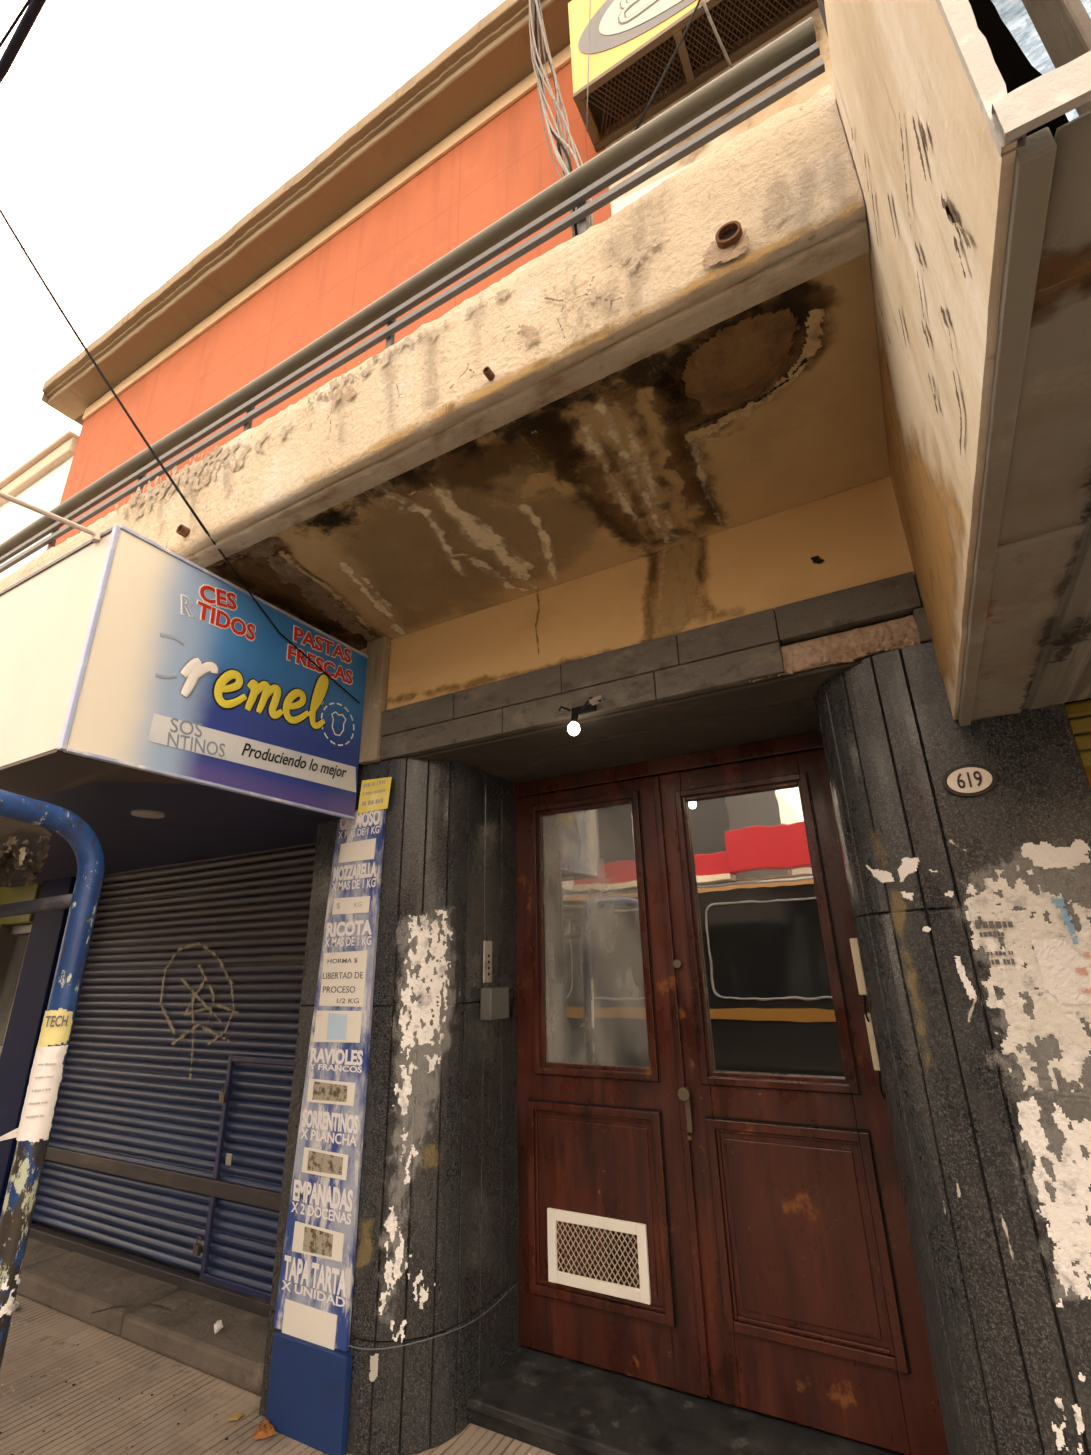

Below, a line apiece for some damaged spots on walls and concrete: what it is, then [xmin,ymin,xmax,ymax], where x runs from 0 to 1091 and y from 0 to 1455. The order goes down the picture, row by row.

water stain [677,229,808,295]
water stain [295,282,834,642]
water stain [212,544,407,645]
crack [533,593,541,653]
water stain [1019,617,1091,709]